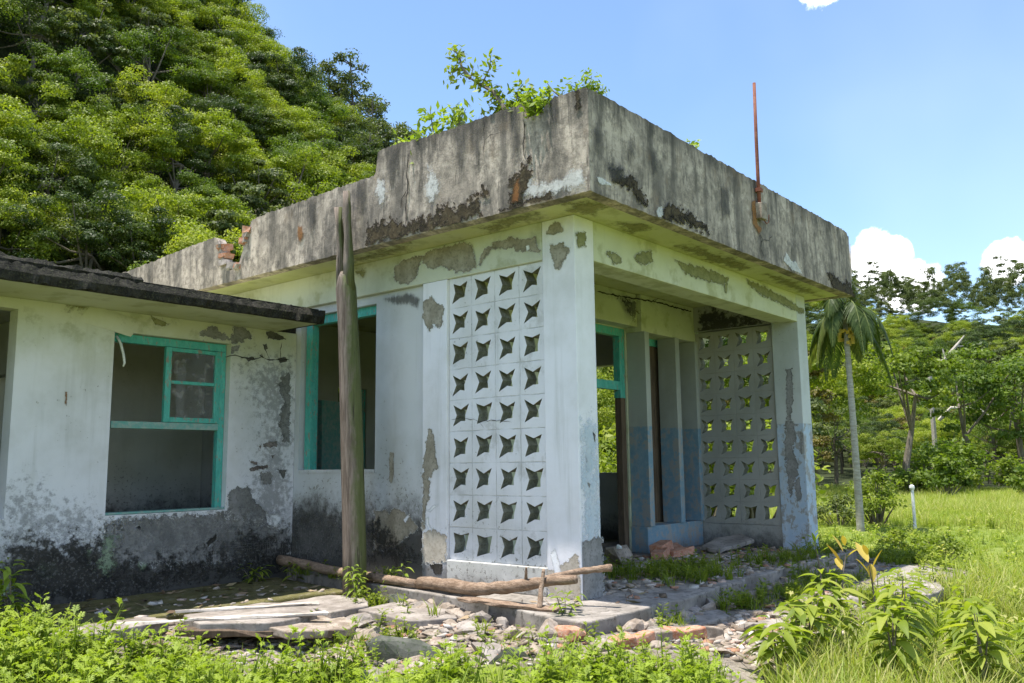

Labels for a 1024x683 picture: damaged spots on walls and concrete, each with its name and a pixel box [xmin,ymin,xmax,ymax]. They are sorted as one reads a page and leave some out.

corrosion [752,201,761,233]
peeling [393,221,587,286]
peeling [198,325,286,362]
crack [227,344,289,361]
peeling [421,296,445,332]
crack [597,291,691,312]
peeling [94,357,292,570]
peeling [783,368,803,502]
peeling [373,428,448,575]
damp [0,504,343,612]